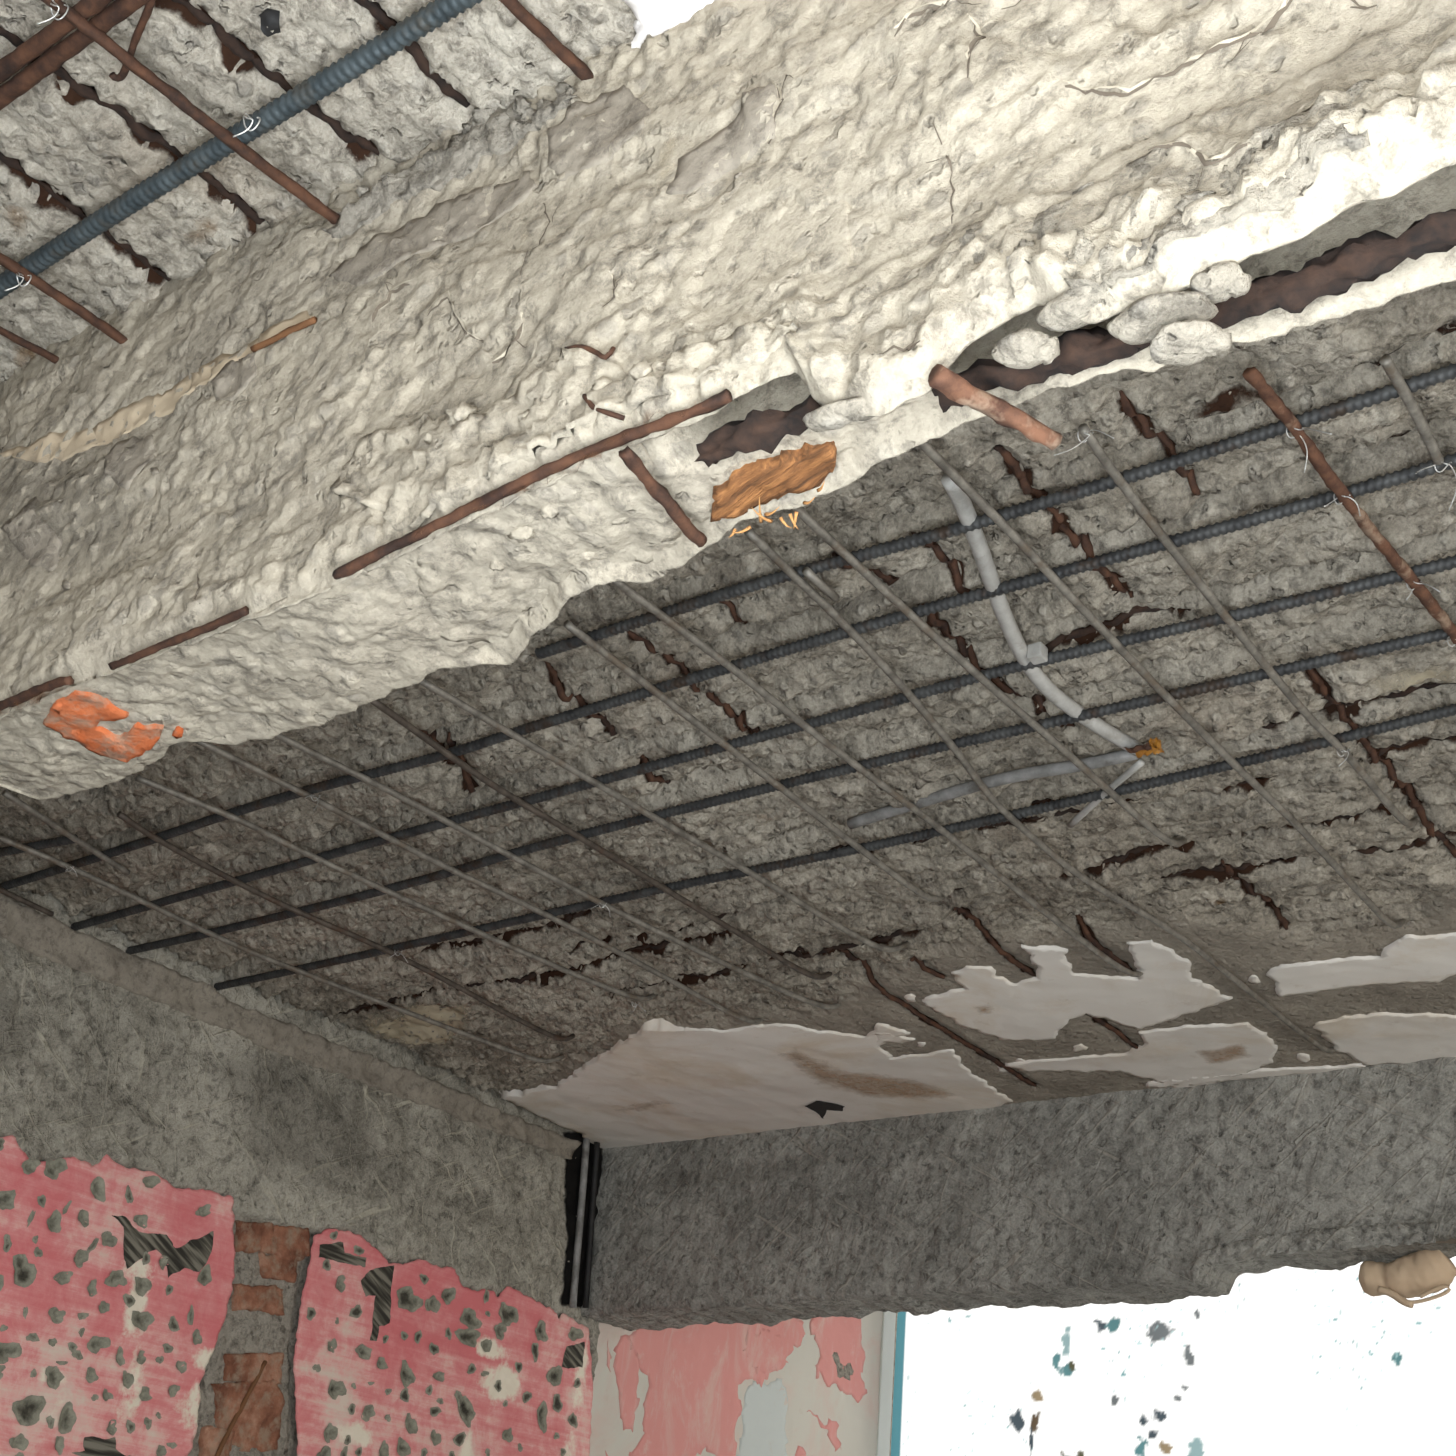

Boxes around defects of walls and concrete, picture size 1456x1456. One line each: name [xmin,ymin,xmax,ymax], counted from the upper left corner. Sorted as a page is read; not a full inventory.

crack [894,0,1021,78]
crack [1063,0,1293,97]
crack [1350,0,1377,10]
spalling [0,0,483,299]
spalling [321,82,650,286]
rust [1209,209,1456,329]
rust [332,389,822,580]
rust [928,326,1201,654]
rust [1304,668,1456,858]
flaking render [0,1158,346,1456]
spalling [312,1273,581,1456]
peeling [607,1316,867,1456]